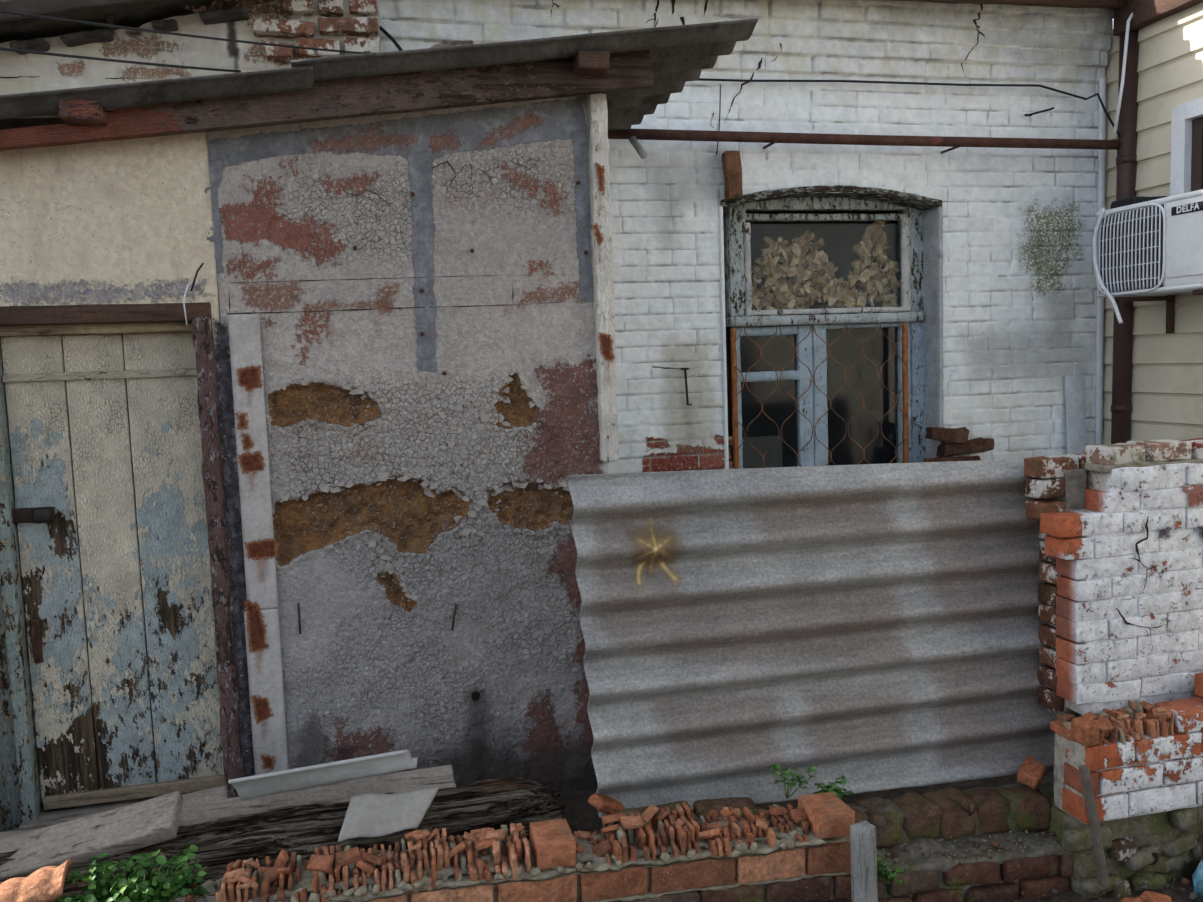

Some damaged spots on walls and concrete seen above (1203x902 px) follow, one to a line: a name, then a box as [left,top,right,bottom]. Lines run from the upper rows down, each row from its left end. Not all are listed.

crack [961,4,985,76]
peeling [500,159,566,216]
spalling [218,156,399,428]
peeling [518,258,580,308]
flaking render [642,435,735,472]
spalling [272,469,472,566]
peeling [1181,484,1203,508]
spalling [377,572,418,612]
peeling [486,354,605,765]
flaking render [1024,454,1175,747]
crack [1116,516,1172,659]
peeling [320,713,396,763]